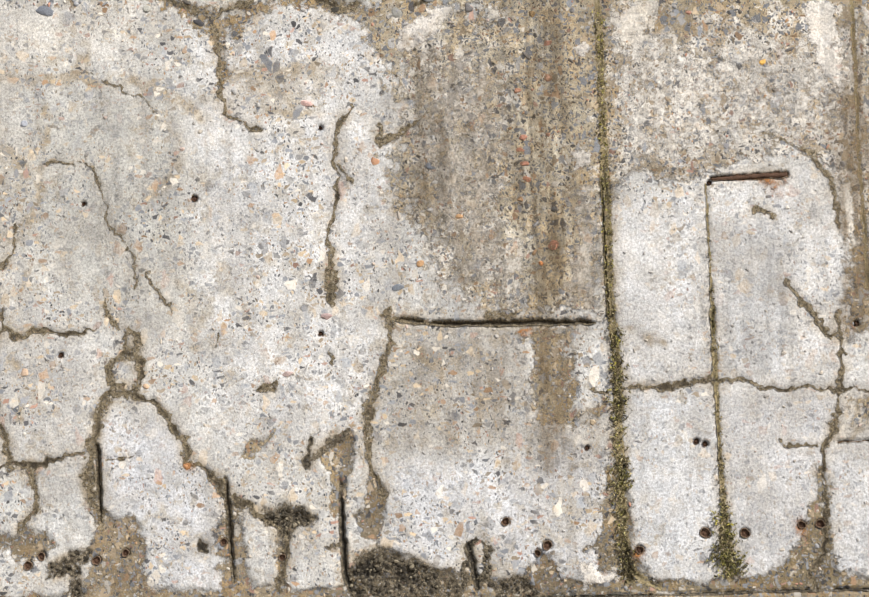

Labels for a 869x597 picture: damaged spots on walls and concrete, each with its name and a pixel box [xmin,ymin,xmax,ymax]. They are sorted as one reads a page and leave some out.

crack [86,71,162,115]
crack [168,0,263,132]
crack [0,223,19,270]
crack [44,160,172,311]
crack [324,104,355,307]
spalling [159,0,869,433]
water stain [534,192,565,303]
corrosion [710,171,789,188]
crack [0,292,292,594]
crack [361,306,398,501]
crack [589,278,869,591]
spalling [62,461,869,597]